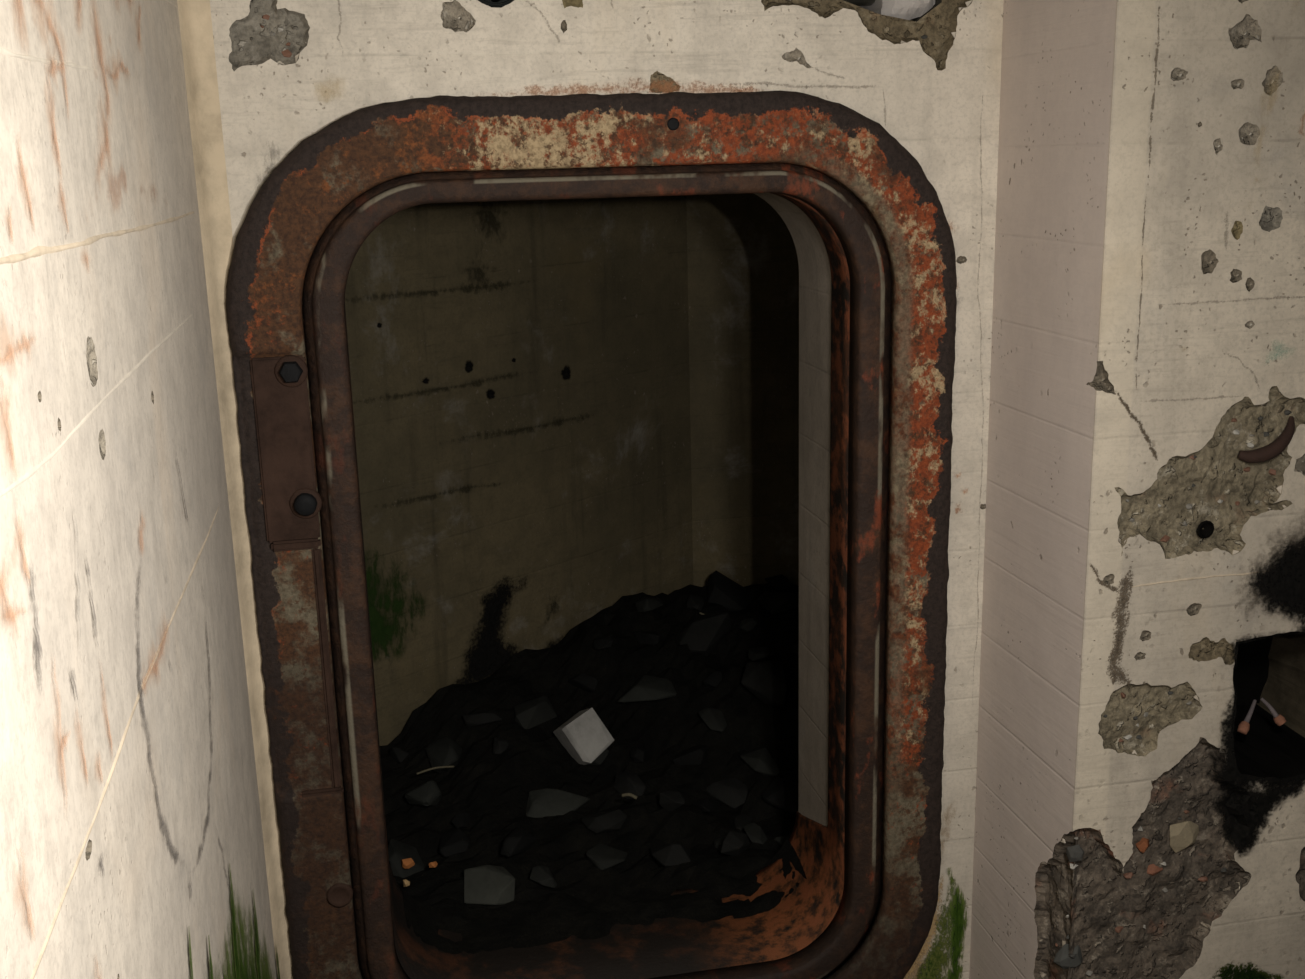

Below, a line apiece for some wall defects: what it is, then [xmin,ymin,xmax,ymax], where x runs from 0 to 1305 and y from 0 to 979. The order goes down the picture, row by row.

spalling [229,0,310,71]
spalling [761,0,973,71]
crack [1118,7,1160,458]
spalling [1114,386,1305,559]
leakage [137,623,179,862]
spalling [1098,682,1202,757]
leakage [190,622,240,979]
leakage [253,893,261,979]
rust [904,880,943,979]
leakage [946,871,967,979]
spalling [1034,737,1251,979]
spalling [1295,847,1305,901]